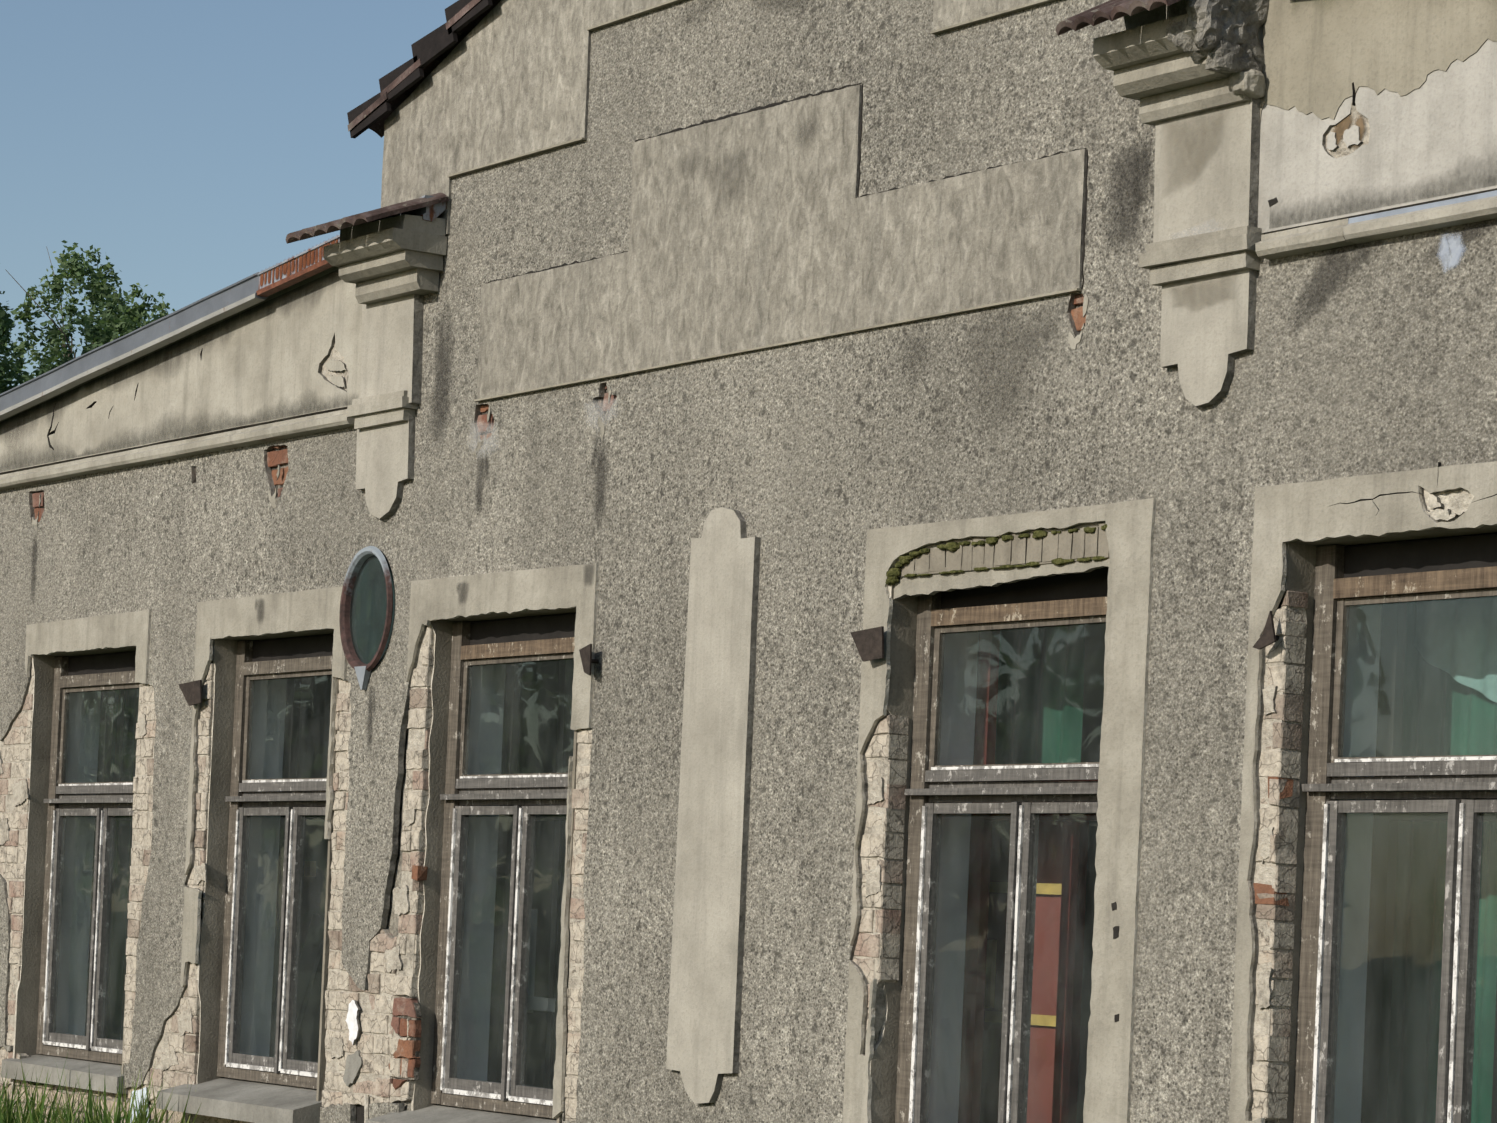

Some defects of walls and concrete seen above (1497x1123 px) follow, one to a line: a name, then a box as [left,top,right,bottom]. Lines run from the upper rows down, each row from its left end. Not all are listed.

peeling [1258,39,1497,234]
crack [1328,462,1441,515]
flaking render [0,663,253,1123]
flaking render [321,626,435,1123]
flaking render [564,728,592,1122]
flaking render [853,715,909,1047]
flaking render [1251,590,1308,1121]